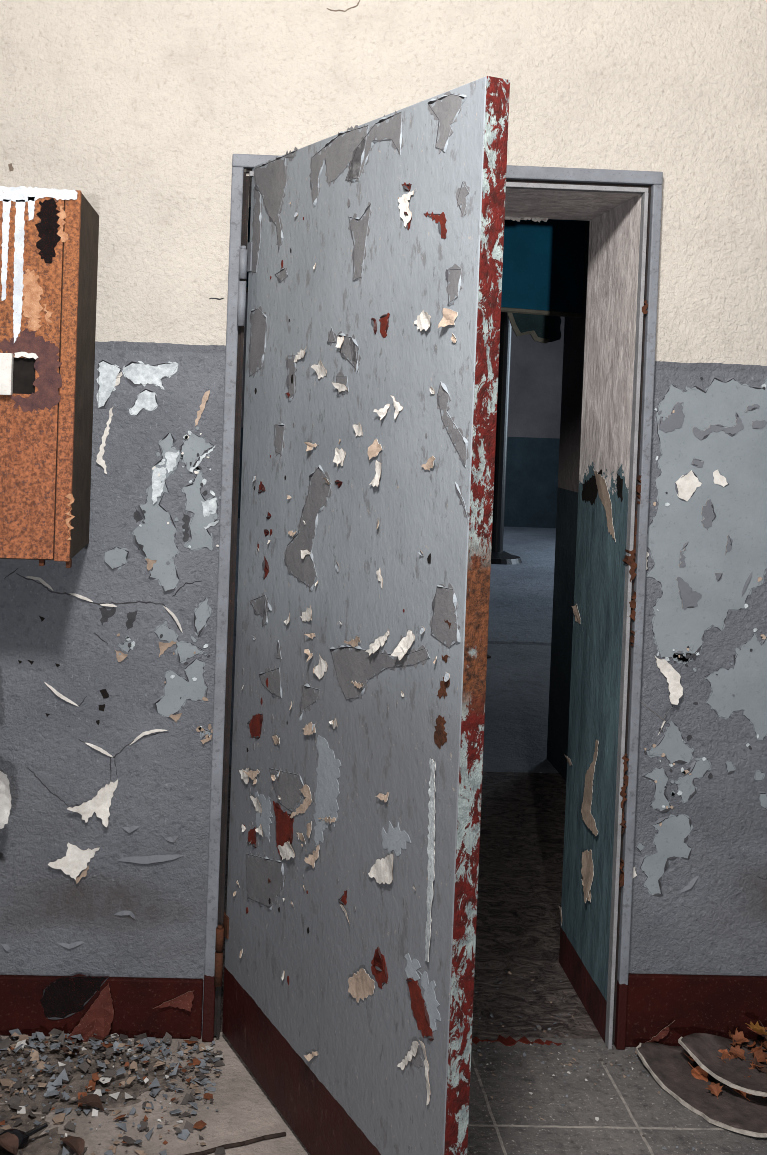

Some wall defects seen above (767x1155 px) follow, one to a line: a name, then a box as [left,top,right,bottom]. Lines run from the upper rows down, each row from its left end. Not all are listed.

peeling [309,111,404,282]
peeling [414,264,462,343]
peeling [96,358,179,474]
peeling [286,327,361,402]
peeling [104,390,221,598]
peeling [152,597,212,722]
peeling [233,439,461,914]
peeling [633,375,767,897]
peeling [0,771,11,829]
peeling [28,757,118,827]
peeling [48,843,99,883]
spalling [40,974,114,1046]